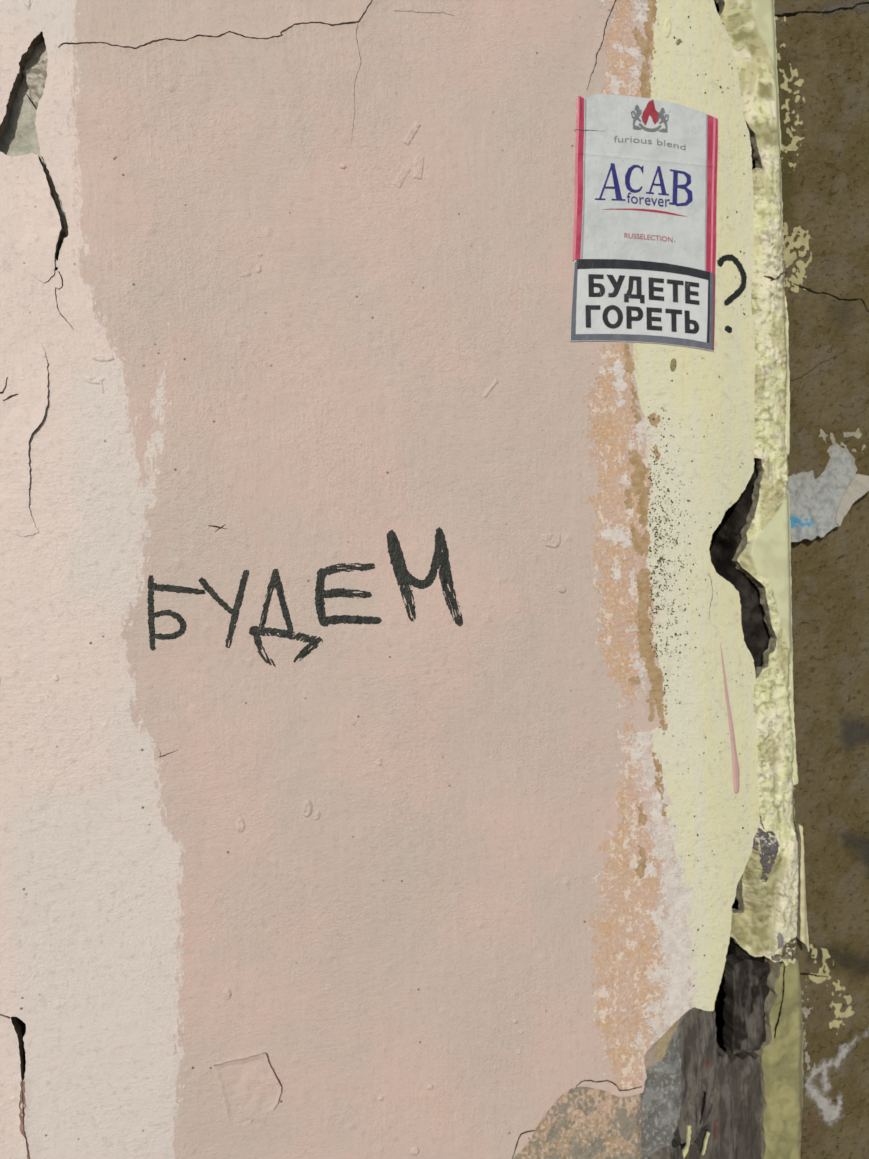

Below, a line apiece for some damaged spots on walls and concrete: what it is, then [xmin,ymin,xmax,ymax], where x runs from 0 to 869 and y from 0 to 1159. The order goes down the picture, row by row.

peeling [0,40,68,283]
crack [58,0,454,140]
peeling [0,344,48,537]
peeling [512,343,698,1159]
spalling [771,933,797,961]
crack [0,1014,30,1159]